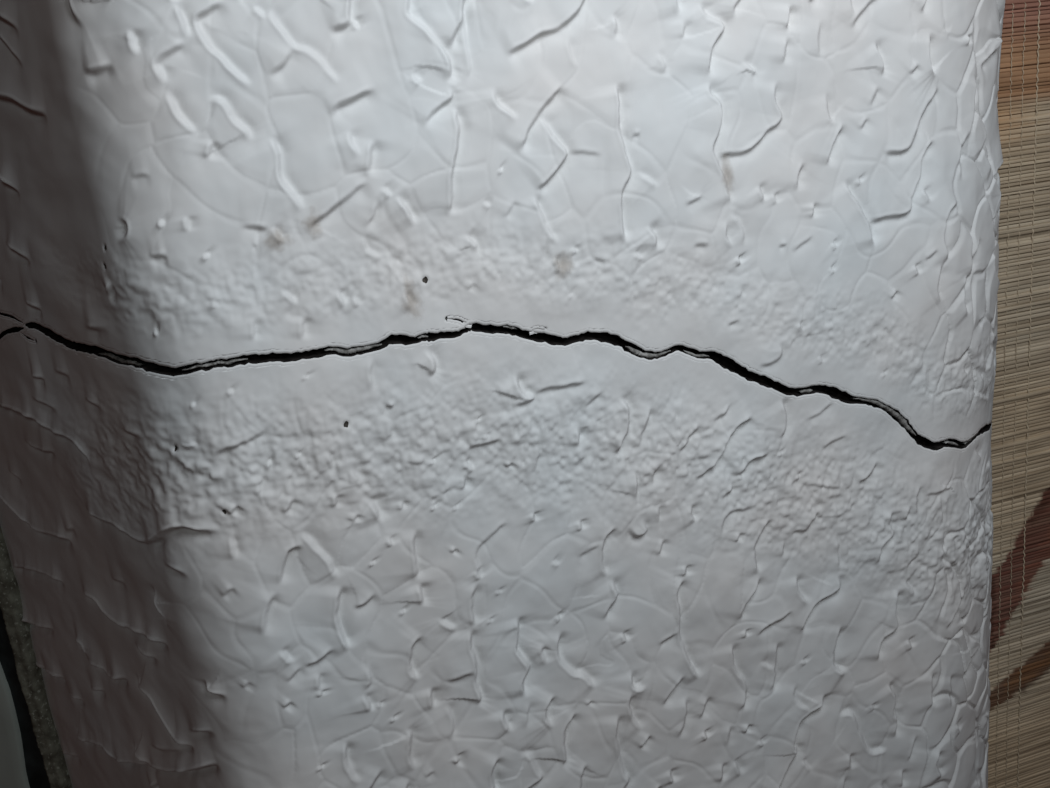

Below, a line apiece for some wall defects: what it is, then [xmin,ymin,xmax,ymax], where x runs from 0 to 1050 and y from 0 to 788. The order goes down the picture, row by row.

crack [0,310,992,453]